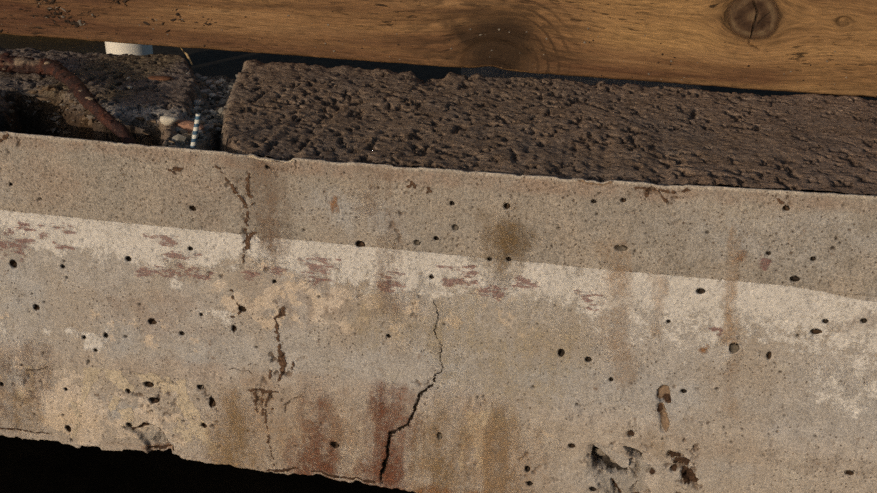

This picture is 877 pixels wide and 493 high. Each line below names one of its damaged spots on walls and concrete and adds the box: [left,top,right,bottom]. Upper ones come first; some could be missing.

crack [214,165,253,205]
crack [242,232,257,264]
crack [229,306,303,466]
crack [380,300,443,484]
corrosion [368,396,408,486]
spalling [592,443,655,493]
spalling [668,451,699,484]